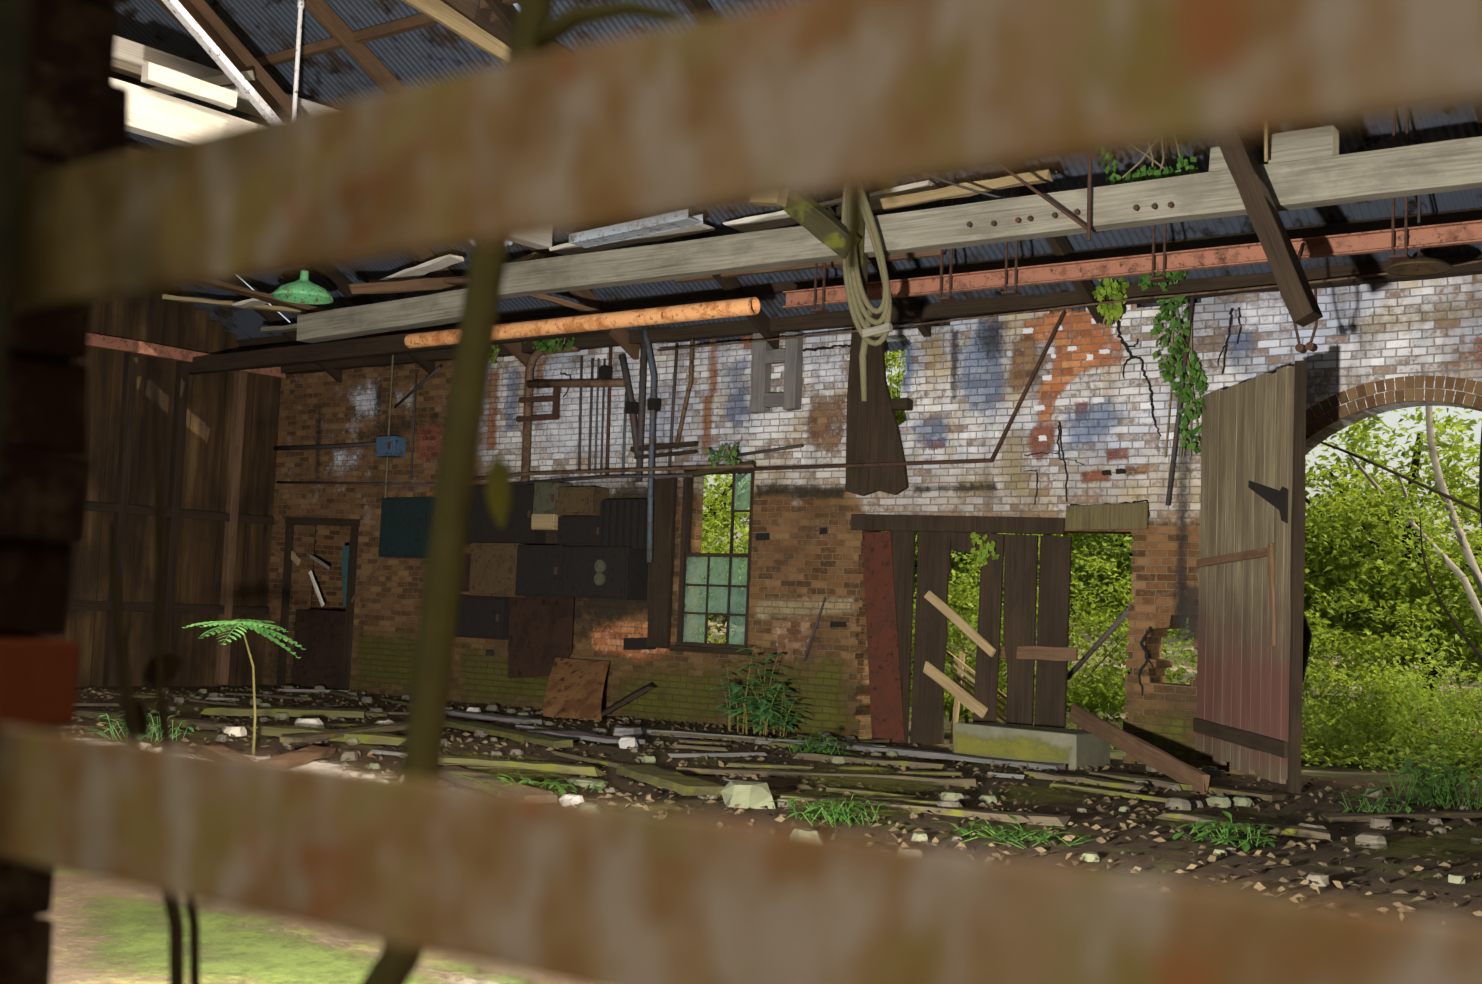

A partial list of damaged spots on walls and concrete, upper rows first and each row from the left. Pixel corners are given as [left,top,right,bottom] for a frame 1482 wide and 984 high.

spalling [1007,309,1125,460]
crack [1115,305,1161,437]
crack [1217,307,1242,374]
spalling [1081,448,1149,483]